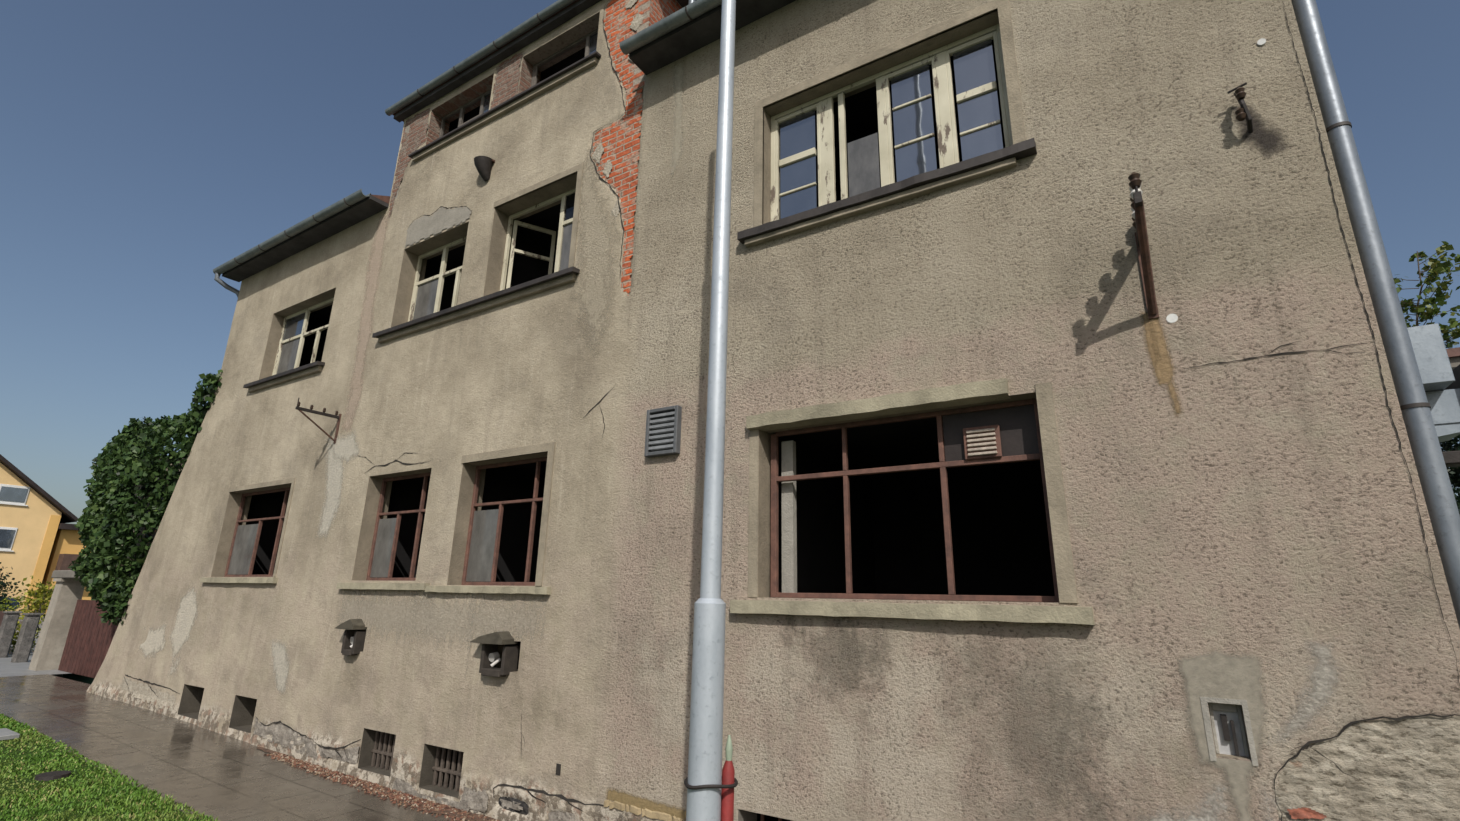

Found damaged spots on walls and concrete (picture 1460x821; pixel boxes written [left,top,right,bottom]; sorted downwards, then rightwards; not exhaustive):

flaking render [577,0,644,344]
water stain [1237,107,1284,153]
corrosion [1143,312,1181,414]
crack [1180,1,1460,686]
peeling [119,588,198,711]
spalling [253,716,360,765]
spalling [1274,714,1460,821]